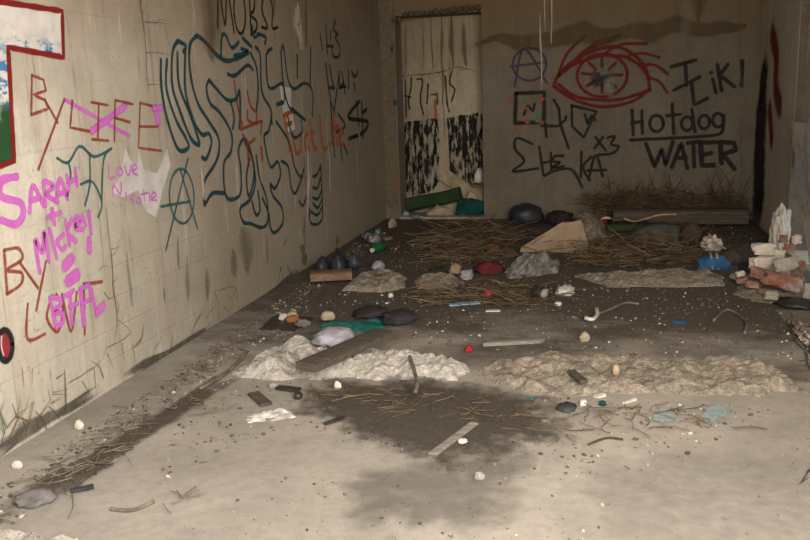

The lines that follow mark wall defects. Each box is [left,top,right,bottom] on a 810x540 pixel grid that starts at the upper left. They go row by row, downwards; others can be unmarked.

crack [139,1,170,91]
crack [0,208,173,442]
crack [64,453,134,518]